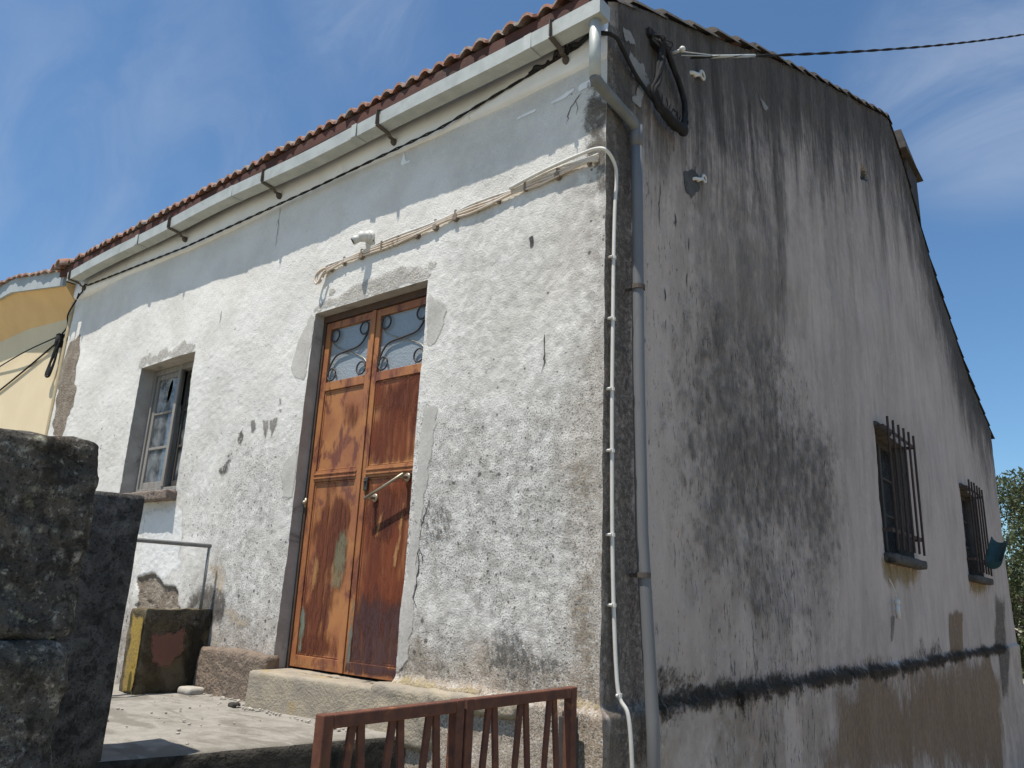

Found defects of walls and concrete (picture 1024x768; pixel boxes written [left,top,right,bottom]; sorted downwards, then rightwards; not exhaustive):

damp [617,2,993,458]
flaking render [52,334,80,436]
crack [413,551,423,605]
flaking render [122,574,186,691]
damp [903,611,964,673]